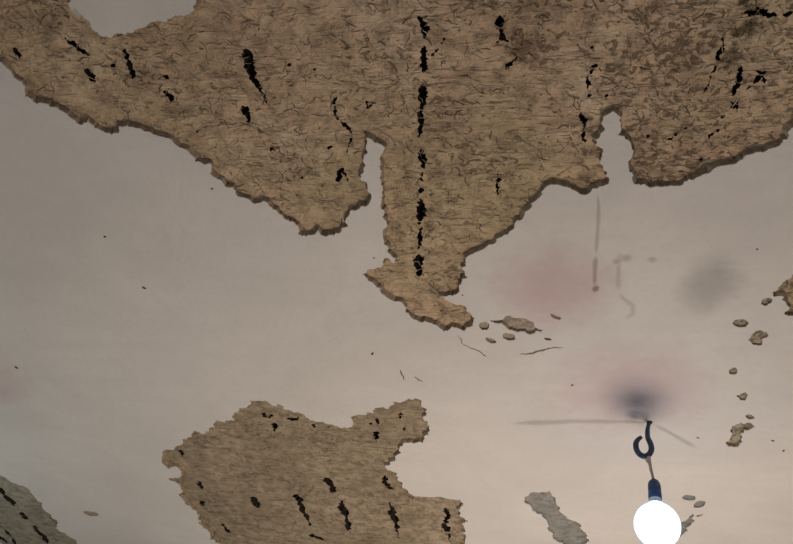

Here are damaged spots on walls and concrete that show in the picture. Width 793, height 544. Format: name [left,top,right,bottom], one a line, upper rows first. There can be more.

crack [494,15,518,70]
crack [744,7,793,18]
crack [241,49,267,122]
spalling [0,0,793,345]
crack [413,16,445,277]
spalling [726,414,754,447]
spalling [161,398,467,544]
spalling [0,476,77,544]
crack [292,494,324,540]
crack [323,478,352,531]
crack [382,475,400,538]
crack [441,508,452,544]